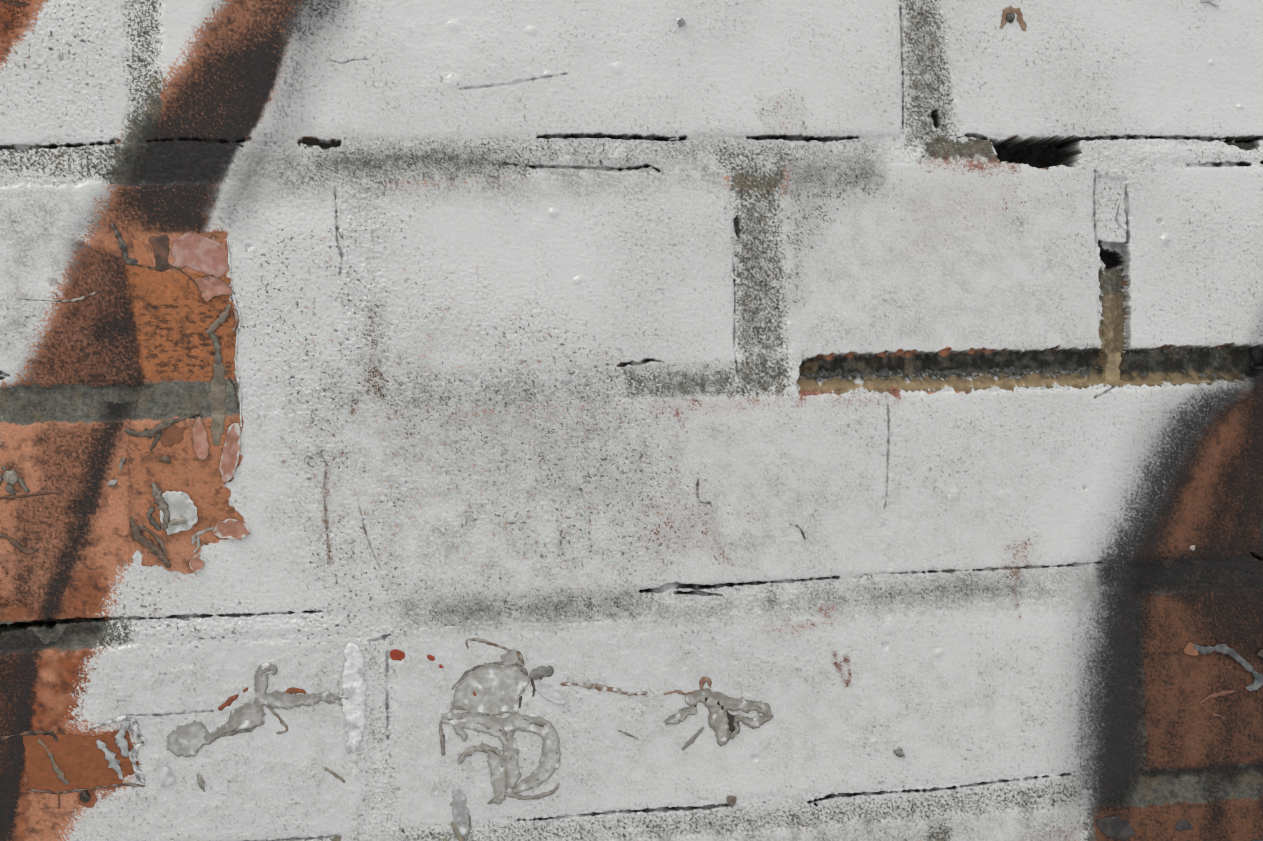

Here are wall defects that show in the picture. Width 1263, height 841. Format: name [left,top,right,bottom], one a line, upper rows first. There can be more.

peeling [15,290,101,302]
peeling [107,223,250,574]
peeling [1184,642,1263,704]
peeling [0,714,146,809]